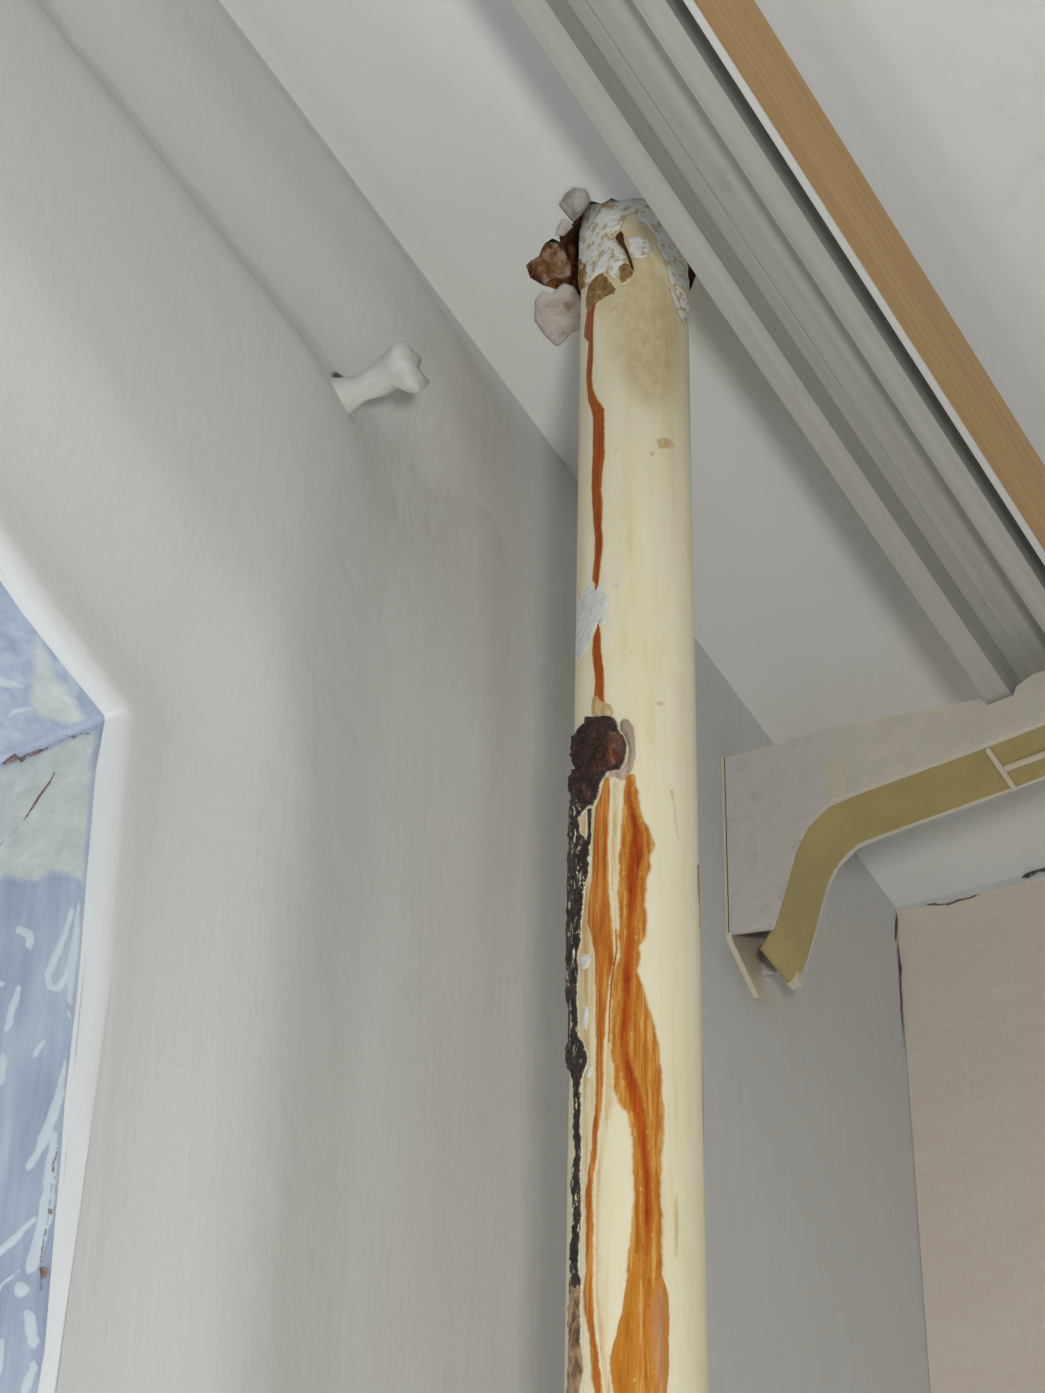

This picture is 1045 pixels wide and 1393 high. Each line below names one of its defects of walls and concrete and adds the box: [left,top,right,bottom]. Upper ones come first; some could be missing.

peeling [526,188,696,346]
corrosion [581,213,687,590]
corrosion [591,624,606,702]
corrosion [564,774,680,1393]